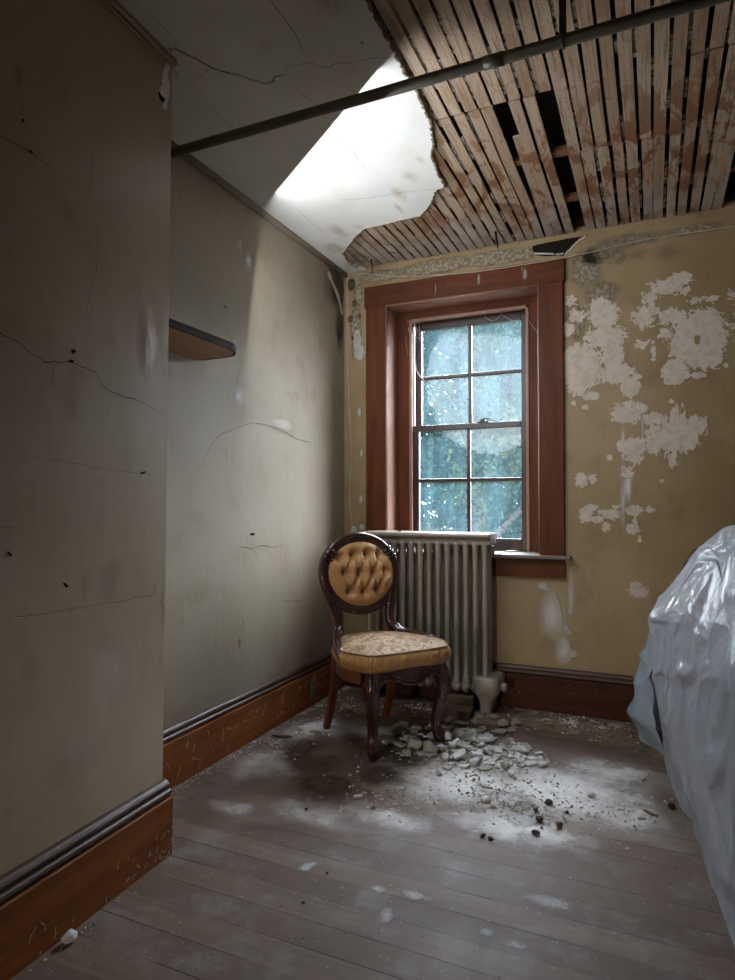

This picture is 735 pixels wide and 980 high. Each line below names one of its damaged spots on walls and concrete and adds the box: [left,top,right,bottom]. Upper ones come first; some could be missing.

crack [133,0,390,163]
flaking render [342,0,735,272]
crack [197,421,311,473]
peeling [574,472,598,489]
peeling [578,503,656,542]
peeling [563,270,735,481]